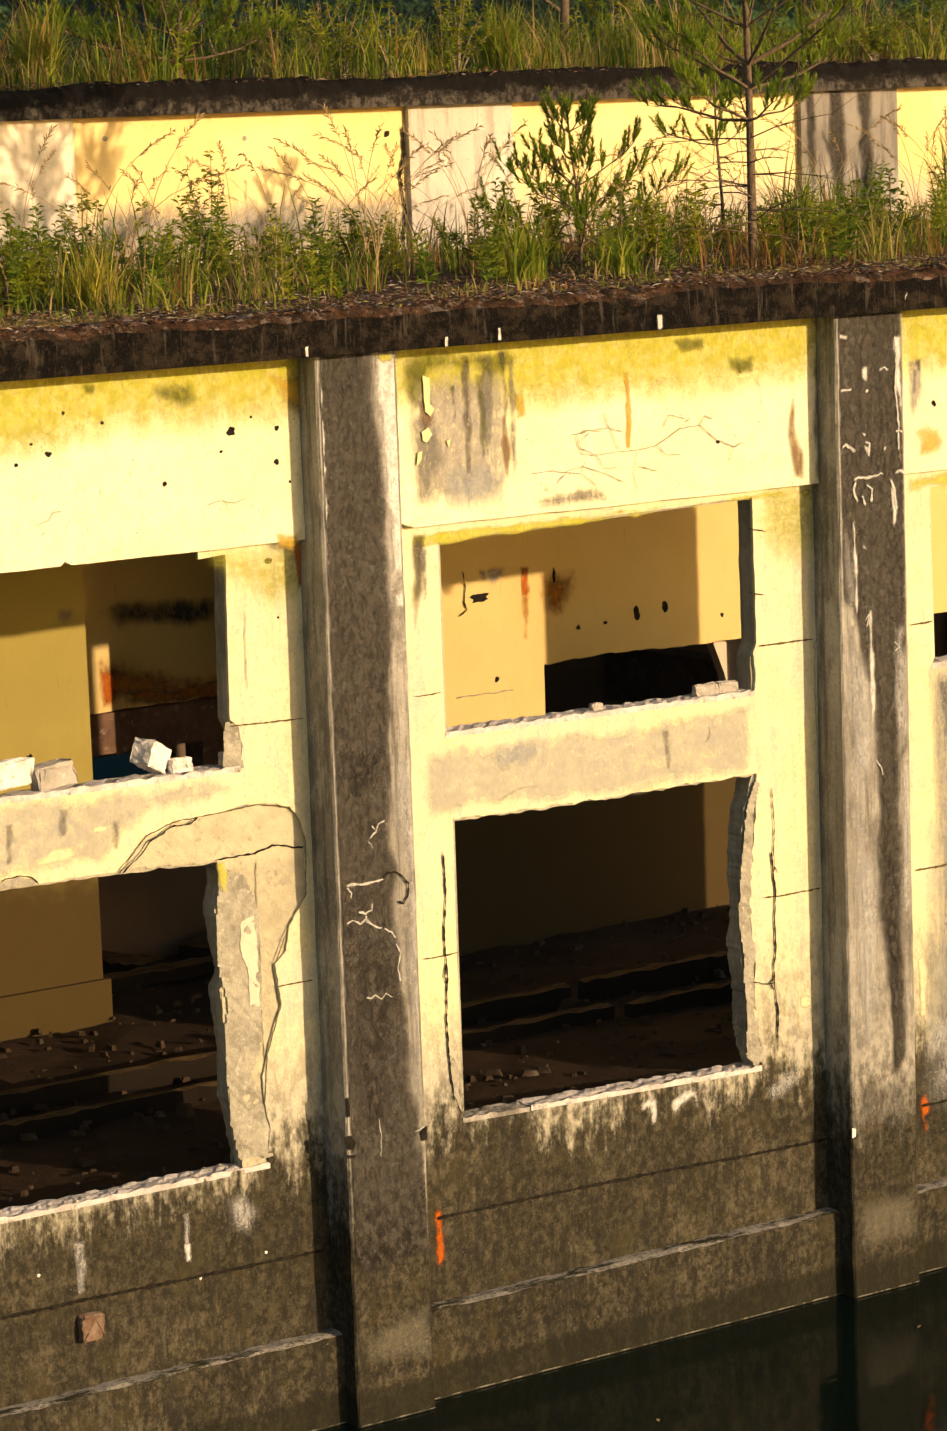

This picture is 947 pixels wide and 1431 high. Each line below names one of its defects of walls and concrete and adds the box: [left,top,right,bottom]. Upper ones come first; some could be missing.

crack [531,411,744,494]
corrosion [789,406,803,476]
spalling [117,803,307,1168]
crack [347,820,459,1101]
damp [305,328,515,1269]
corrosion [522,568,530,636]
damp [431,711,747,810]
spalling [739,778,766,1066]
crack [753,790,820,1042]
damp [839,311,920,1116]
corrosion [435,1211,444,1264]
damp [362,1293,841,1427]